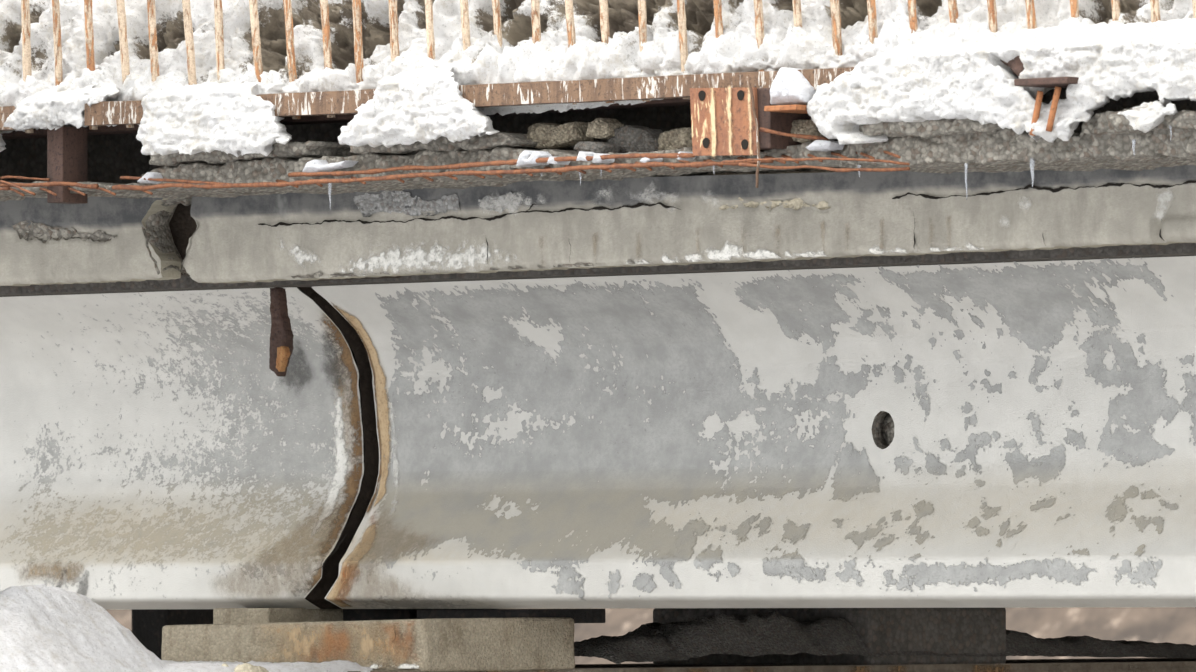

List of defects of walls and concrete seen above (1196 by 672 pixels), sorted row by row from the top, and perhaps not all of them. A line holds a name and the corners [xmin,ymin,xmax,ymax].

corrosion [709,86,732,156]
spalling [859,118,1002,138]
spalling [1082,108,1196,136]
peeling [291,257,1196,601]
crack [313,534,347,572]